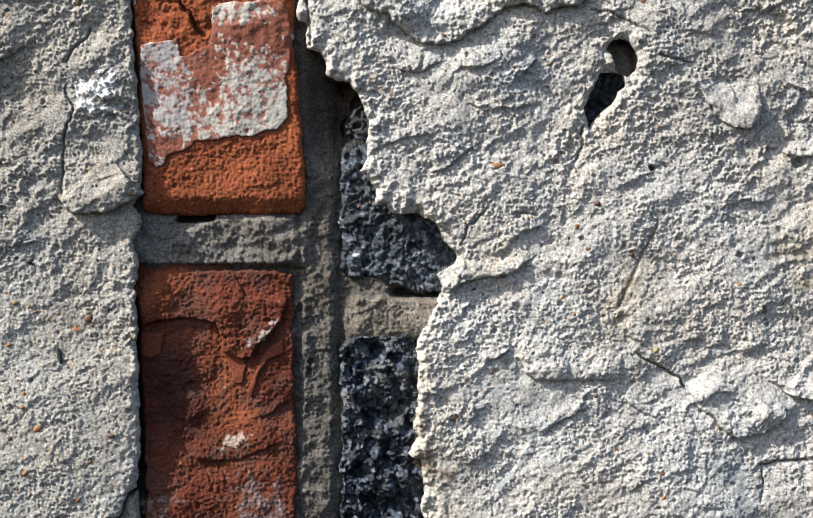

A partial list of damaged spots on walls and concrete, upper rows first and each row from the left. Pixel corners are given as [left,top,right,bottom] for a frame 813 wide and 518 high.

flaking render [0,15,36,59]
peeling [140,0,294,167]
flaking render [426,126,481,173]
spalling [134,264,287,397]
crack [636,353,685,389]
crack [757,458,807,503]